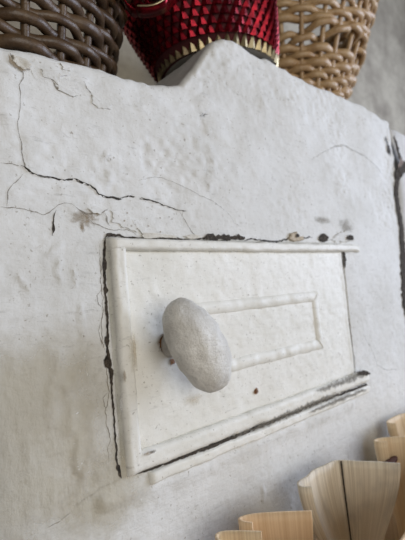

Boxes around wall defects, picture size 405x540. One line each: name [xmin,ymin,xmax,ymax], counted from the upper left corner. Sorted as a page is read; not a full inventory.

crack [4,71,195,235]
crack [97,257,105,349]
crack [103,368,111,463]